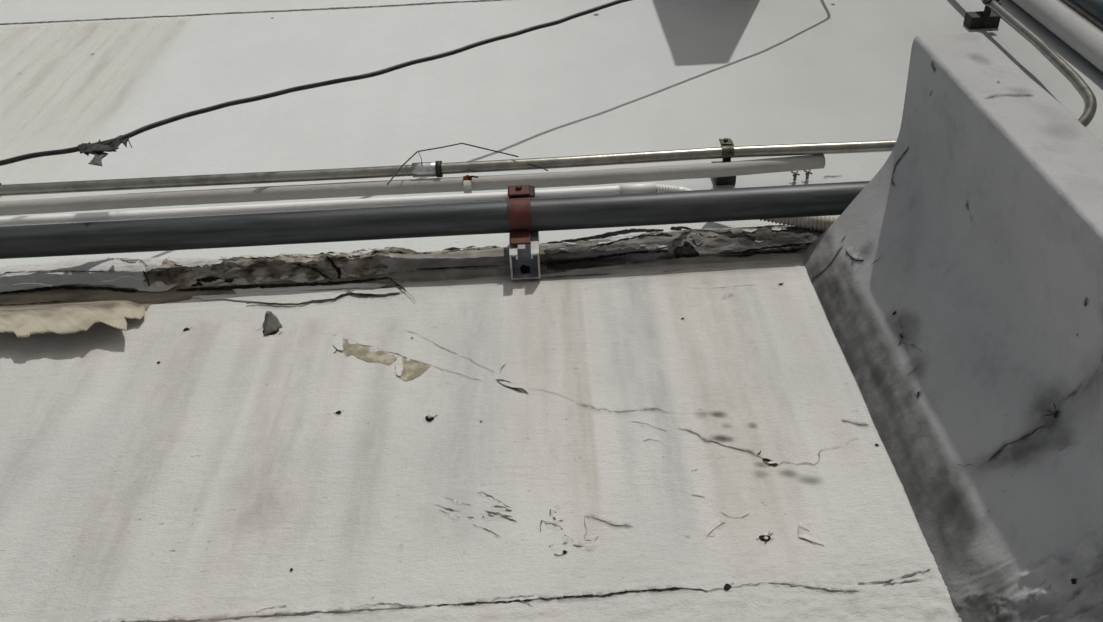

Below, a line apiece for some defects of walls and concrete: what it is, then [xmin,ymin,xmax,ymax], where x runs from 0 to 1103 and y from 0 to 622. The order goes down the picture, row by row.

flaking render [540,225,824,273]
peeling [0,246,498,338]
crack [246,265,613,305]
peeling [327,332,431,381]
crack [406,330,504,381]
crack [531,388,869,465]
crack [957,355,1103,468]
crack [38,569,931,622]